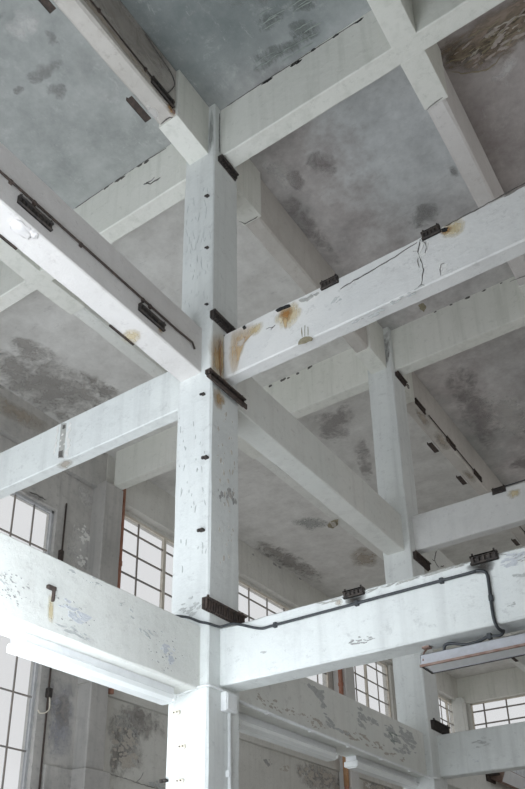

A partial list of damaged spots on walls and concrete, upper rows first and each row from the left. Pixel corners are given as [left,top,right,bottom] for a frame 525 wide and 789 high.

crack [444,183,525,227]
crack [341,240,448,289]
corrosion [275,304,297,327]
corrosion [214,325,260,376]
damp [0,338,114,417]
damp [252,544,314,580]
peeling [55,595,95,641]
peeling [256,683,417,762]